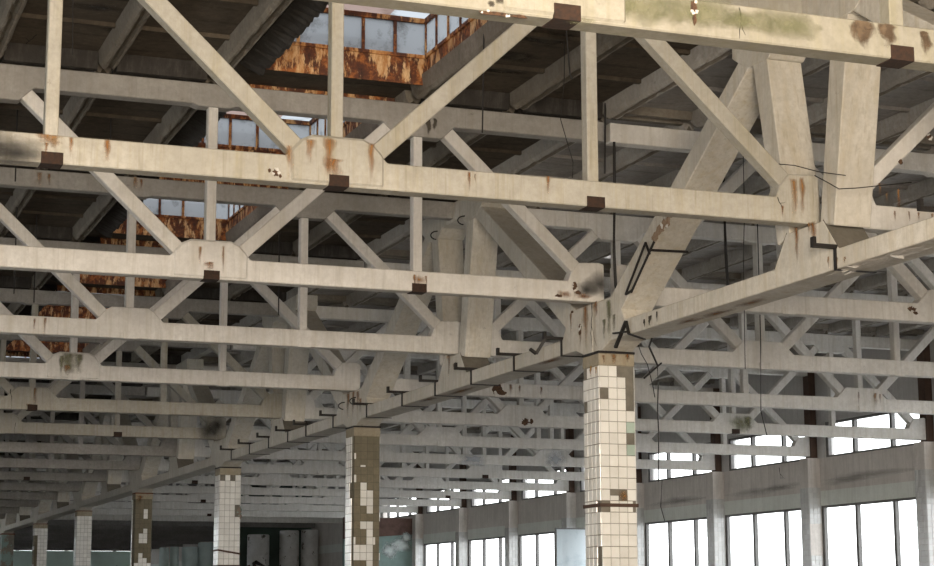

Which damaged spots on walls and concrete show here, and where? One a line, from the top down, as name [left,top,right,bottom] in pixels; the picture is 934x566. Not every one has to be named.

corrosion [326,139,338,170]